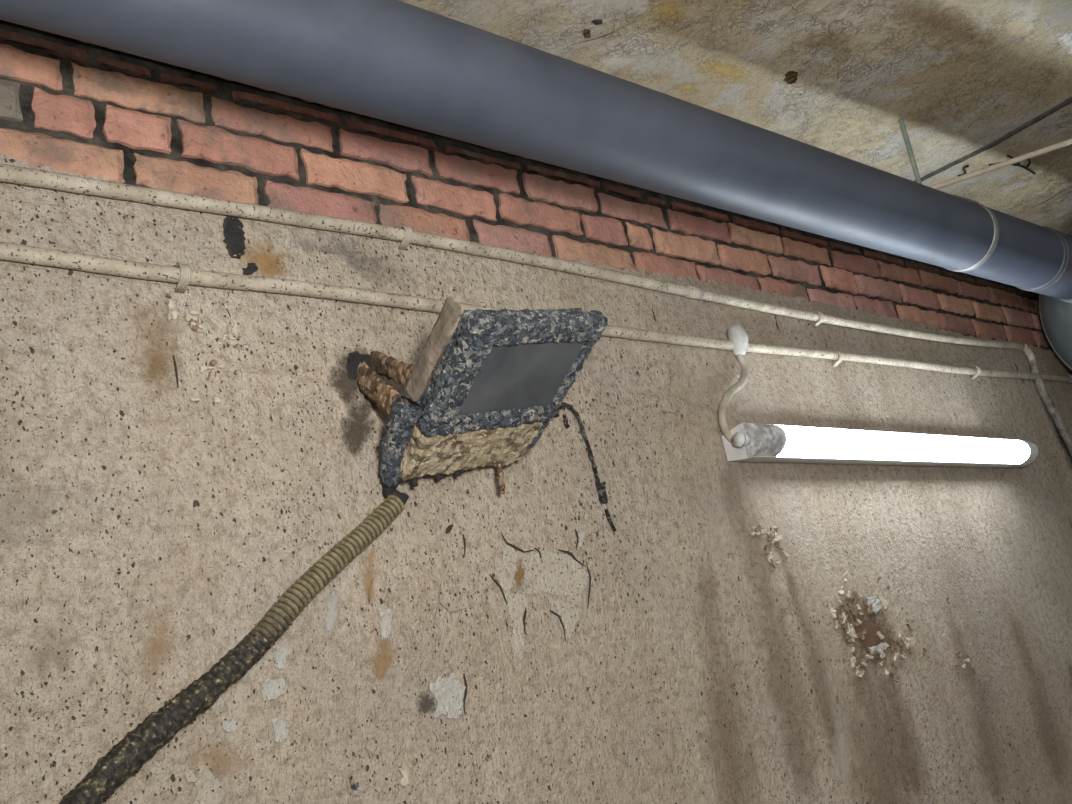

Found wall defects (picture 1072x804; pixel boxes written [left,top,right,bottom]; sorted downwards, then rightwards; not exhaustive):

spalling [751,524,790,568]
peeling [489,524,591,662]
spalling [827,572,927,682]
peeling [260,642,291,701]
peeling [429,673,466,720]
peeling [272,717,289,743]